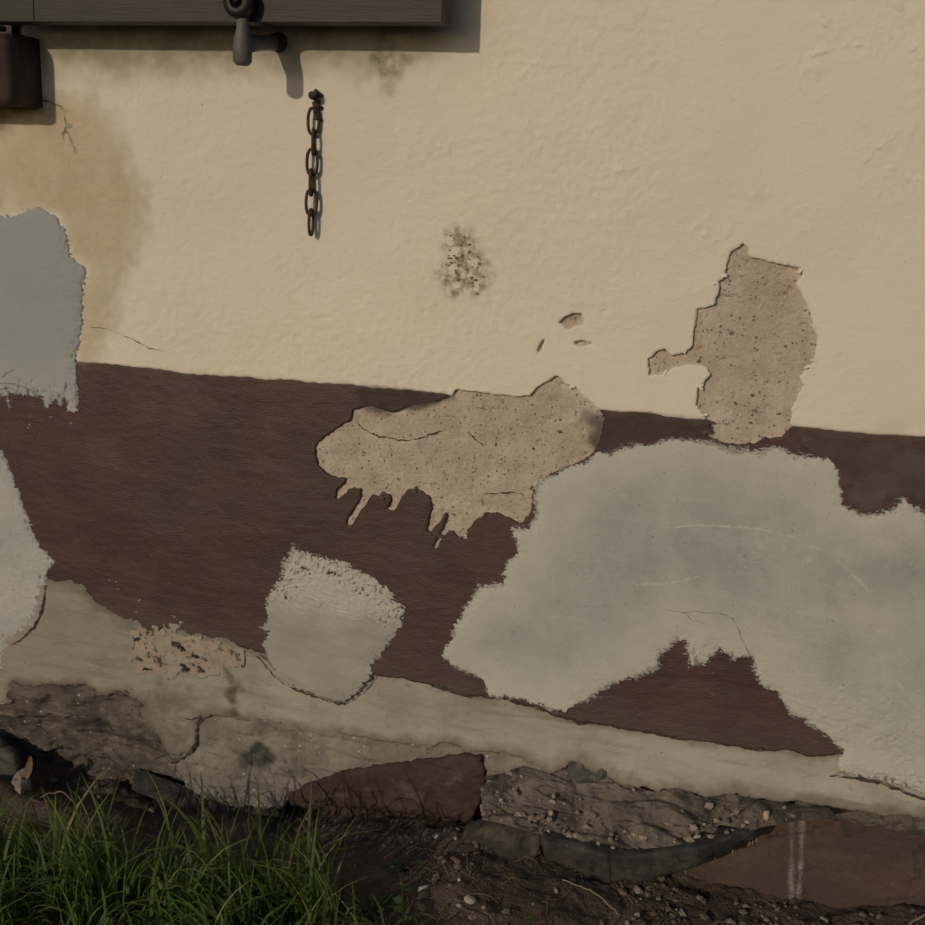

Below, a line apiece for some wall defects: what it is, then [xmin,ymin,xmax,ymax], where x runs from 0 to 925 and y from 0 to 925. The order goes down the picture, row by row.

leakage [444,228,485,295]
flaking render [560,313,584,329]
spalling [648,244,817,444]
spalling [316,376,607,548]
peeling [130,623,245,680]
spalling [0,680,925,849]